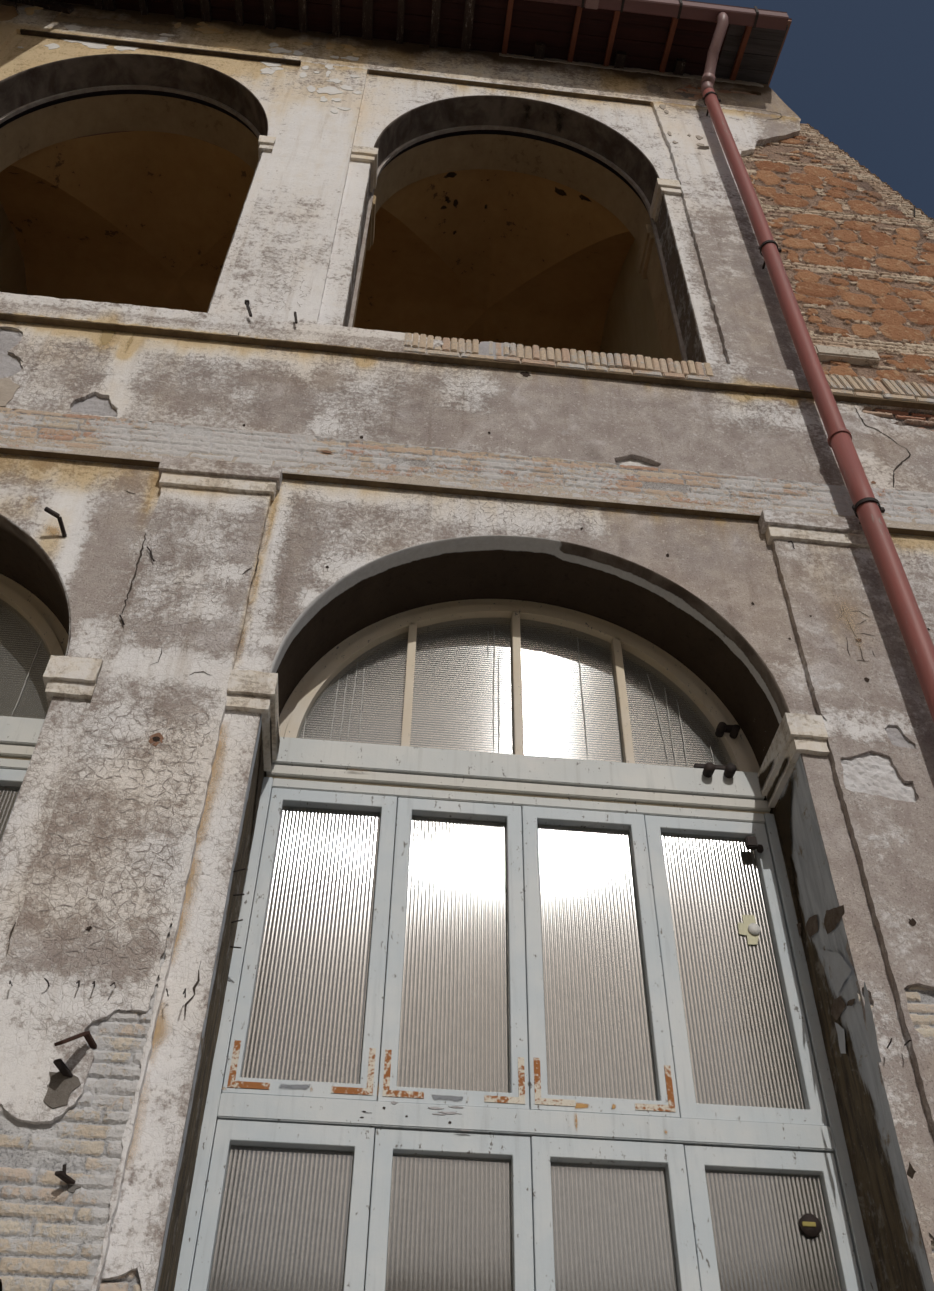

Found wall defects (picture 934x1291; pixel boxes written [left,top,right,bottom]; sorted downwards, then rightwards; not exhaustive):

flaking render [0,329,23,407]
flaking render [71,395,117,417]
crack [856,409,911,488]
flaking render [841,726,916,802]
flaking render [904,986,934,1038]
flaking render [0,925,172,1291]